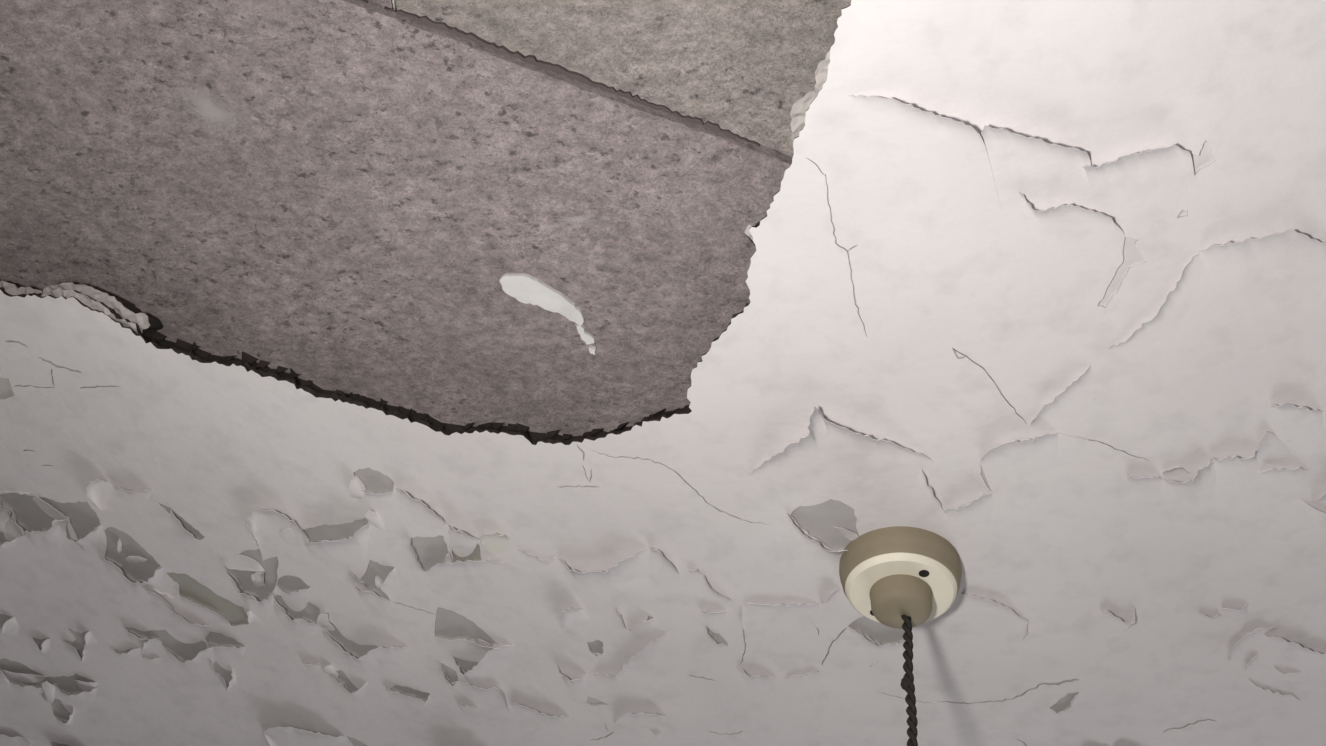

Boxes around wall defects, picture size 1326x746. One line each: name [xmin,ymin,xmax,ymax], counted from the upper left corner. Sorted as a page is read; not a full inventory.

flaking render [0,0,851,445]
crack [807,158,867,336]
peeling [848,94,1216,308]
crack [5,340,120,389]
crack [952,347,1027,424]
crack [557,445,768,525]
crack [1064,434,1149,461]
peeling [786,495,859,565]
peeling [0,468,609,746]
peeling [848,616,905,666]
peeling [1227,627,1326,701]
peeling [1050,692,1080,718]